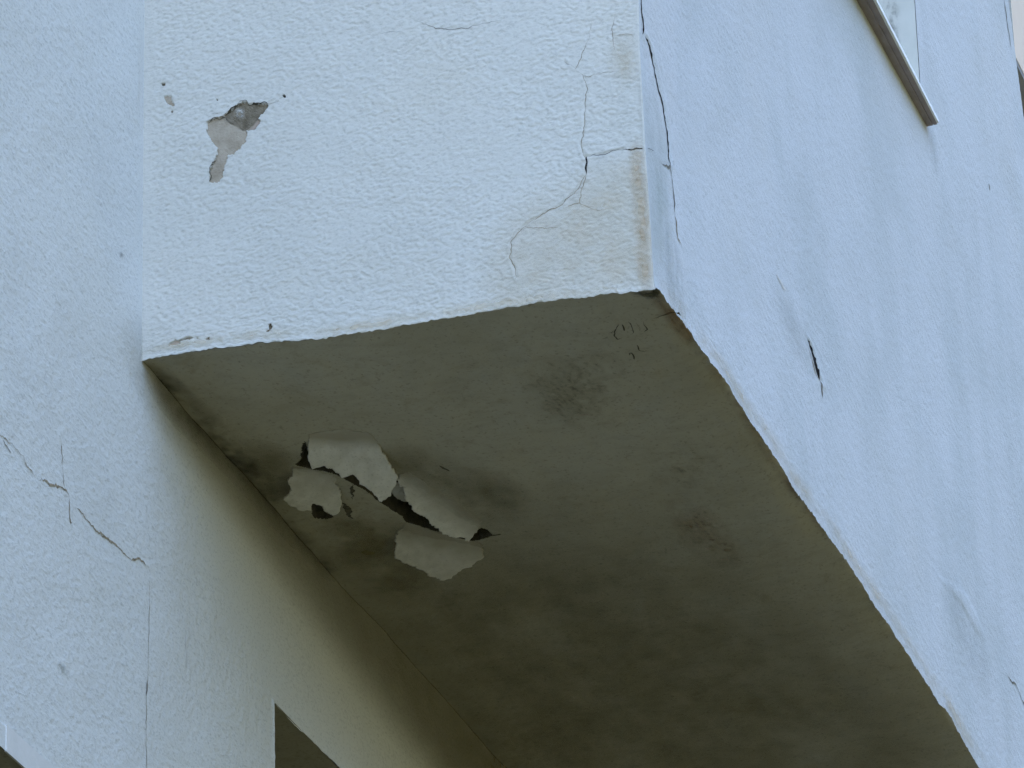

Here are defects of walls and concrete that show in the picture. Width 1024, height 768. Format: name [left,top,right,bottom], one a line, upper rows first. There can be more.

spalling [206,95,286,183]
crack [509,0,681,287]
crack [808,341,823,396]
crack [0,435,150,650]
peeling [283,430,501,581]